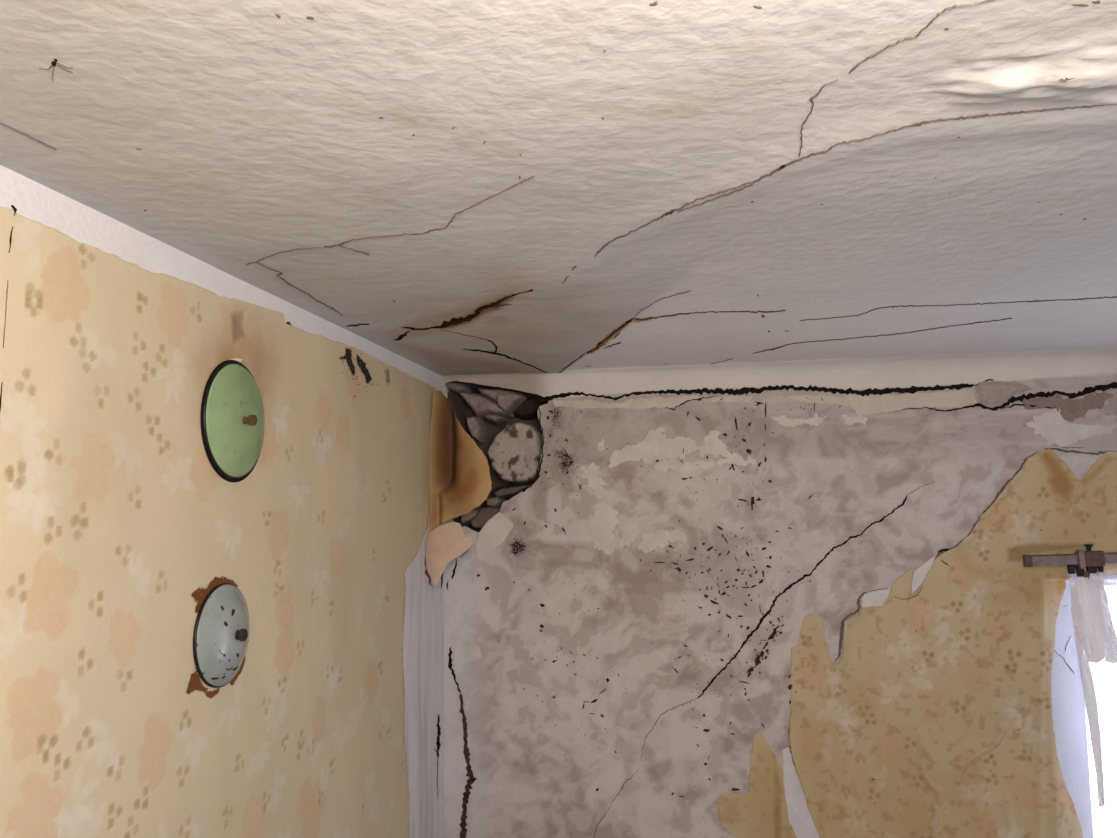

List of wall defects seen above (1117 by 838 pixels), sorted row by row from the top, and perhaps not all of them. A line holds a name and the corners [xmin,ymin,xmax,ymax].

crack [0,122,57,151]
crack [563,0,1116,284]
leakage [339,348,391,397]
crack [247,176,535,327]
leakage [321,242,671,376]
crack [395,289,1117,412]
spalling [446,381,757,561]
crack [594,482,933,837]
crack [434,647,477,838]